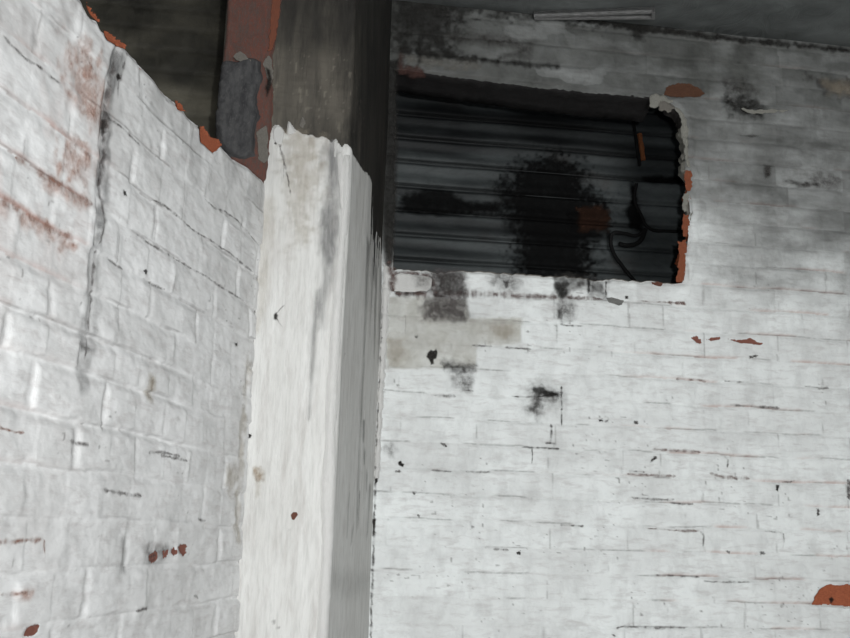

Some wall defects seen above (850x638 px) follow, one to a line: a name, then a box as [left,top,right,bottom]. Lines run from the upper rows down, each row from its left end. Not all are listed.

spalling [86,2,126,49]
damp [578,20,849,52]
damp [401,38,532,67]
spalling [199,126,222,153]
spalling [650,83,705,284]
spalling [148,544,187,563]
spalling [812,584,850,609]